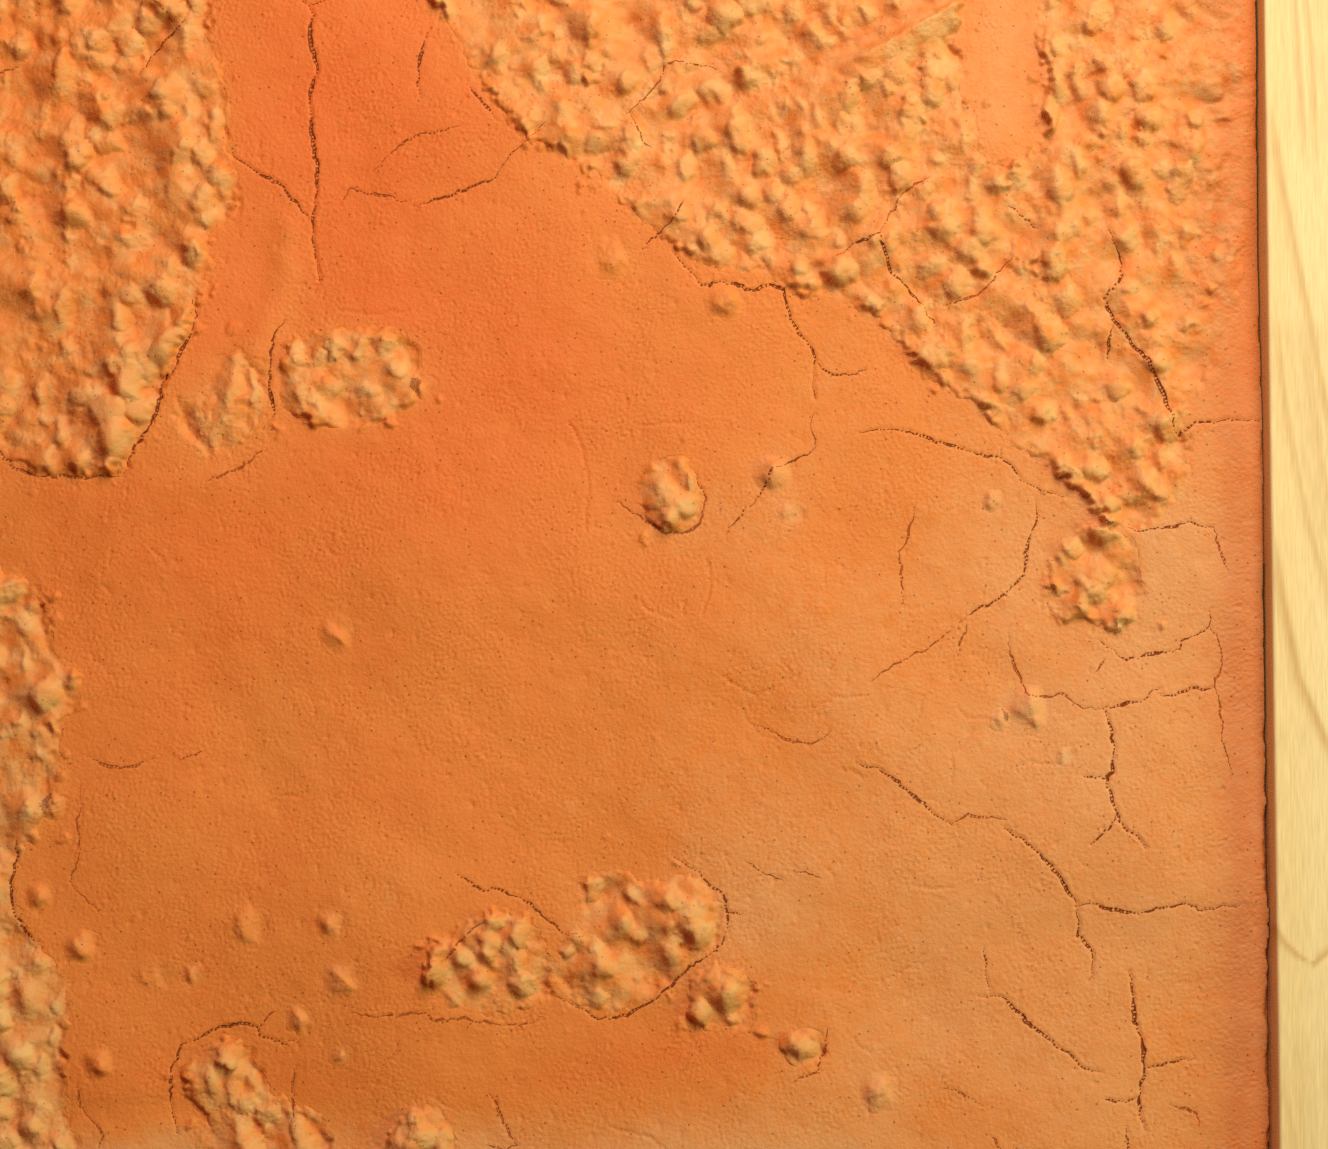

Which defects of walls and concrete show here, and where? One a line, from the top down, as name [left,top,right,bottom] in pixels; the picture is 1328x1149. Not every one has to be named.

crack [233,0,545,281]
crack [617,200,866,535]
crack [1103,230,1256,436]
crack [859,429,1062,681]
crack [1129,521,1229,571]
crack [764,728,830,744]
crack [1008,614,1232,844]
crack [356,854,740,1026]
crack [862,765,1240,977]
crack [794,1029,828,1082]
crack [982,951,1184,1149]